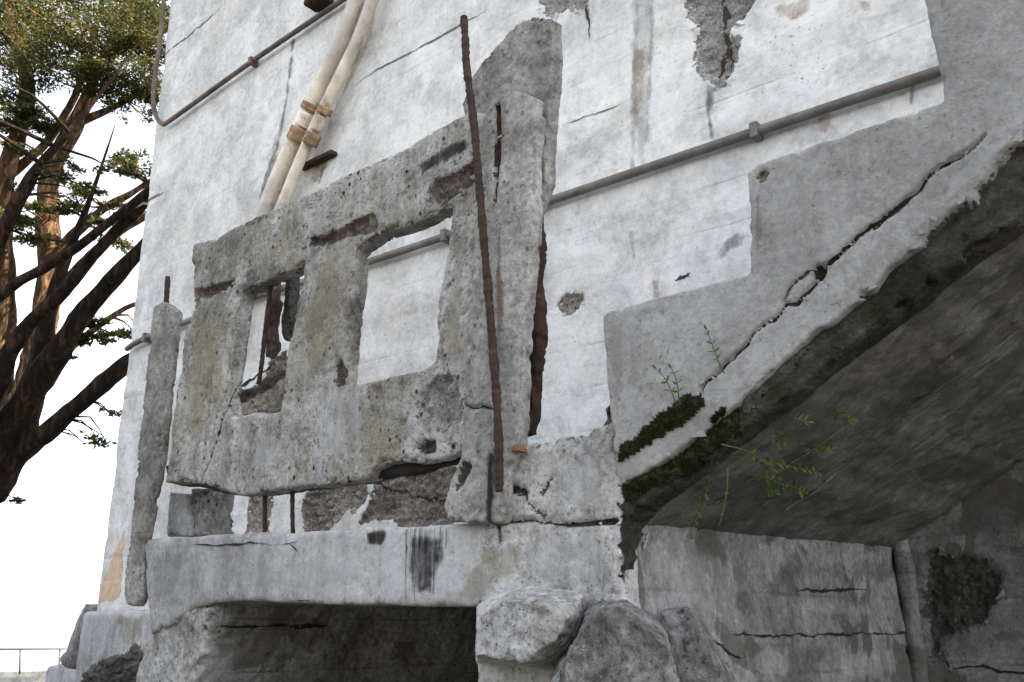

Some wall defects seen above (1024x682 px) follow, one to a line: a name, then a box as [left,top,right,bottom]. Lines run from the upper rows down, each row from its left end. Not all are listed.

crack [353,16,477,86]
spalling [684,0,756,91]
crack [569,103,623,123]
crack [700,140,983,391]
rust [528,218,548,437]
spalling [556,290,585,316]
spalling [290,369,472,534]
crack [195,541,298,552]
damp [405,527,447,600]
crack [797,586,868,594]
spalling [919,545,1005,662]
crack [715,631,906,659]